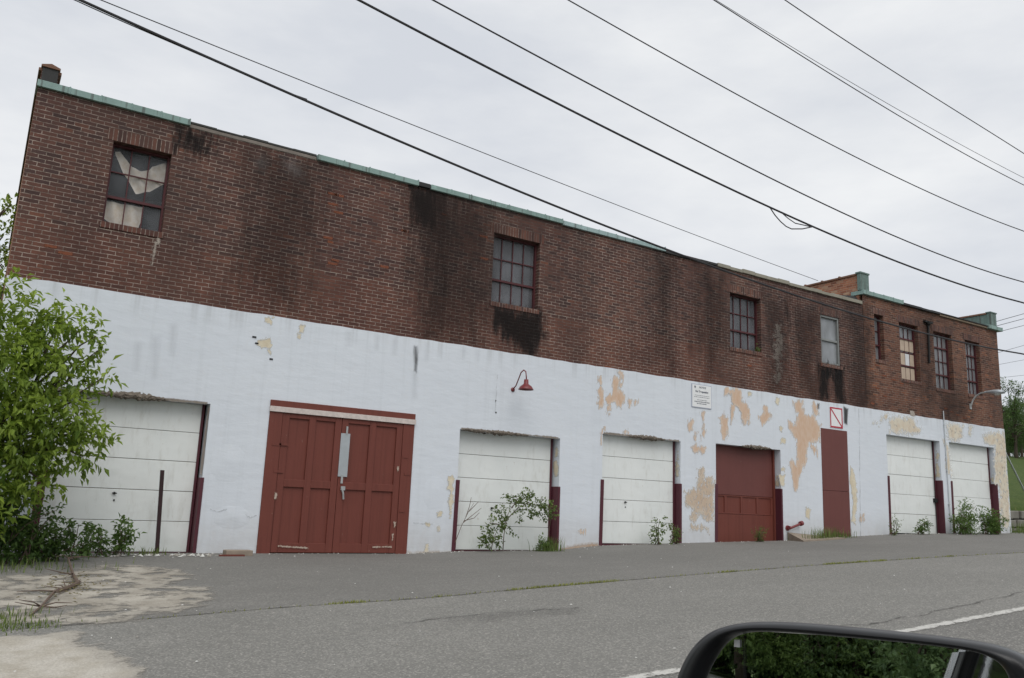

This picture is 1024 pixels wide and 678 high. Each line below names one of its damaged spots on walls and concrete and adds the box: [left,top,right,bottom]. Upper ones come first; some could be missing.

leakage [172,127,212,157]
leakage [493,307,544,356]
peeling [425,475,455,532]
peeling [596,365,680,477]
peeling [684,411,716,532]
peeling [718,387,822,492]
leakage [818,367,848,424]
peeling [935,407,1010,529]